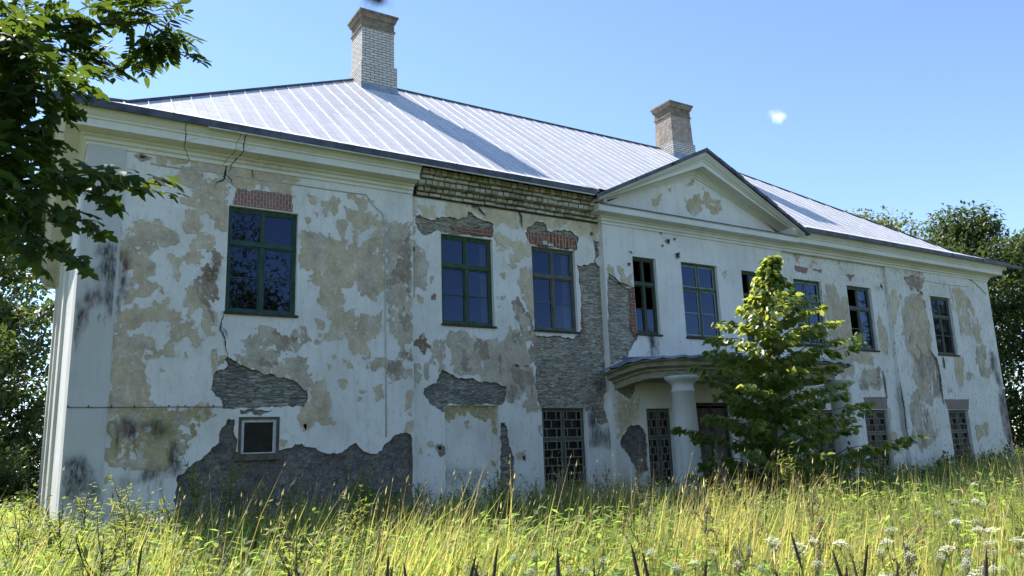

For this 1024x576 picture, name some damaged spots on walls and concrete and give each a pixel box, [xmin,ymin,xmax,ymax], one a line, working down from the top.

crack [213,135,254,189]
crack [196,286,228,355]
flaking render [104,153,648,531]
peeling [794,254,992,456]
damp [65,460,96,497]